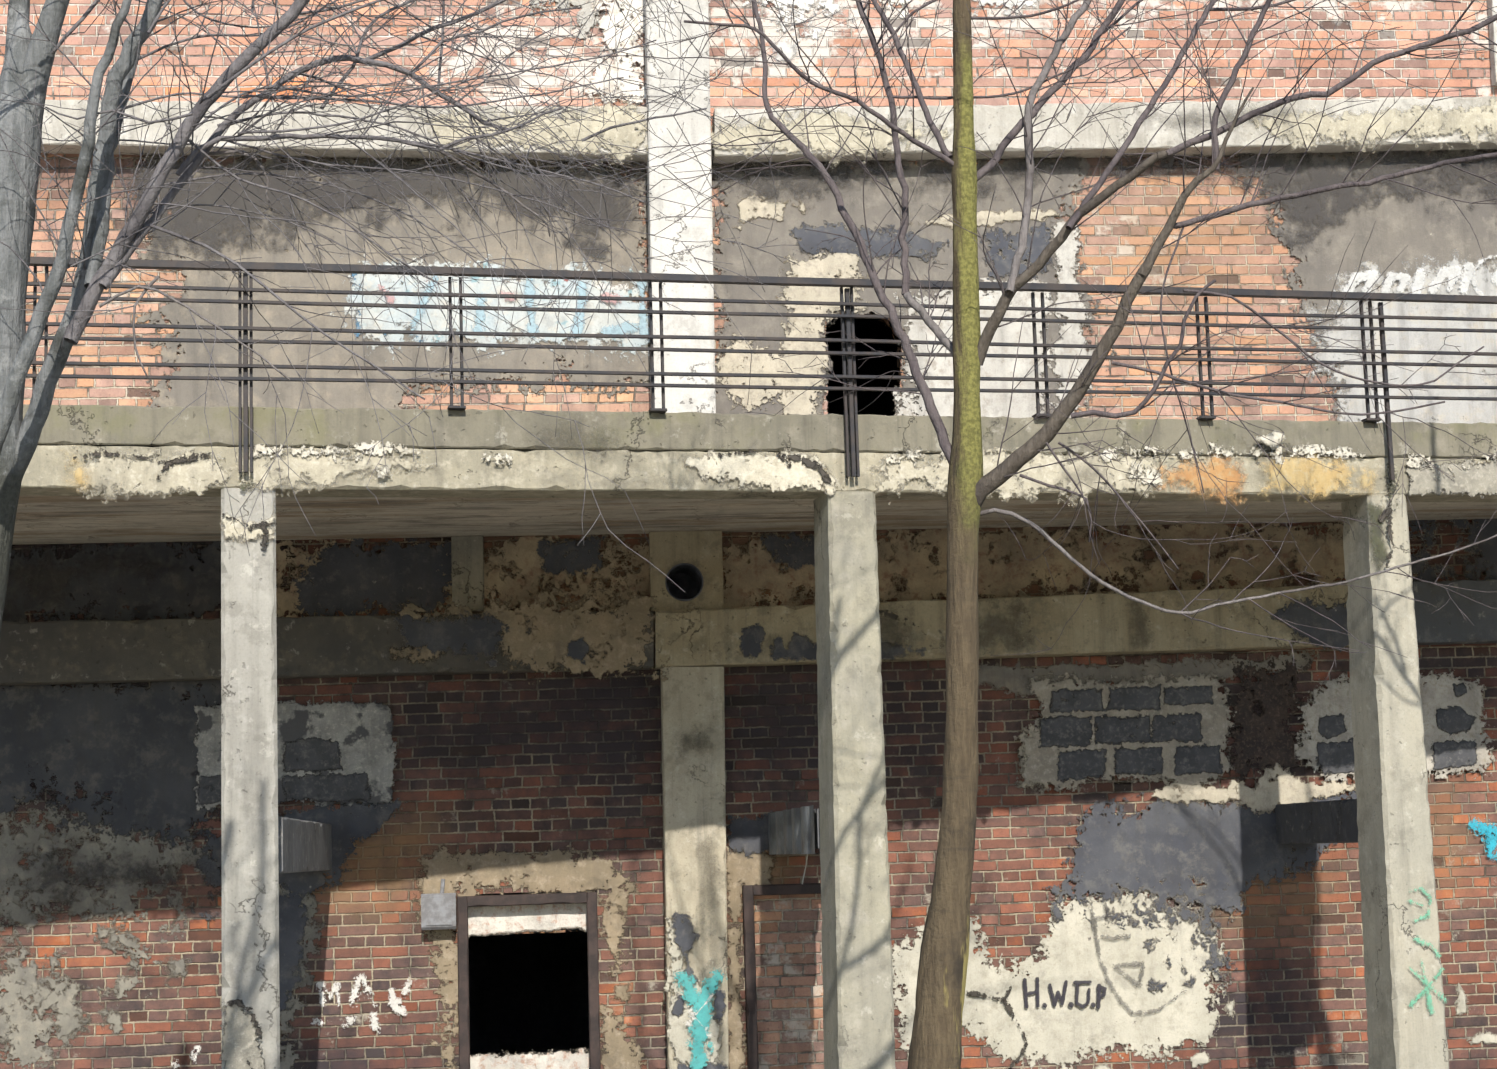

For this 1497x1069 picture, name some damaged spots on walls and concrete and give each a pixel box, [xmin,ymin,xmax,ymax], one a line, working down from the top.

peeling [772,41,798,63]
spalling [1256,430,1286,448]
peeling [66,444,436,502]
spalling [682,446,838,496]
peeling [870,447,949,504]
peeling [982,447,1158,506]
peeling [291,538,452,617]
peeling [536,534,606,576]
peeling [739,623,817,662]
peeling [59,1009,124,1039]
spalling [219,1004,265,1069]
peeling [599,983,647,1069]